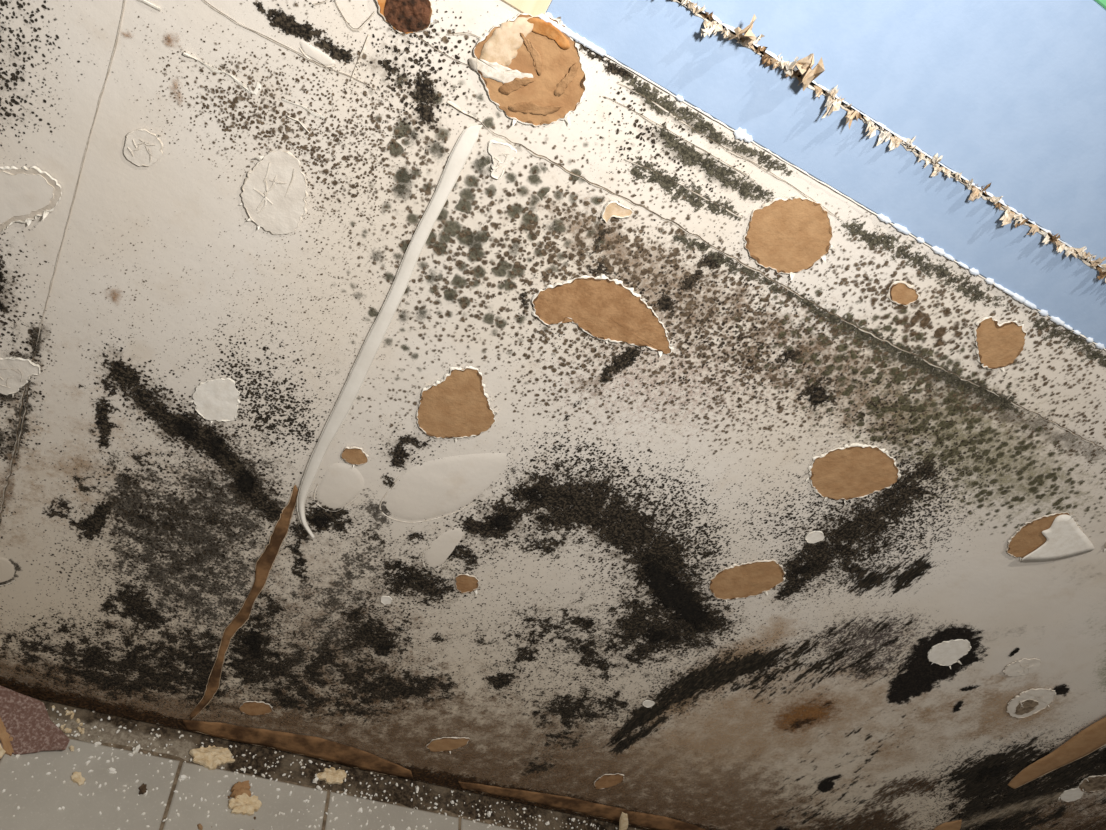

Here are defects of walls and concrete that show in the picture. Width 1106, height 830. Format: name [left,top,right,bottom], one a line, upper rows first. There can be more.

water stain [0,0,83,165]
peeling [376,0,437,34]
peeling [469,12,587,127]
water stain [150,0,517,336]
water stain [569,137,594,184]
peeling [743,197,836,280]
water stain [0,232,57,372]
peeling [531,274,676,357]
water stain [0,377,66,517]
water stain [370,371,441,489]
peeling [416,366,497,441]
peeling [927,639,971,669]